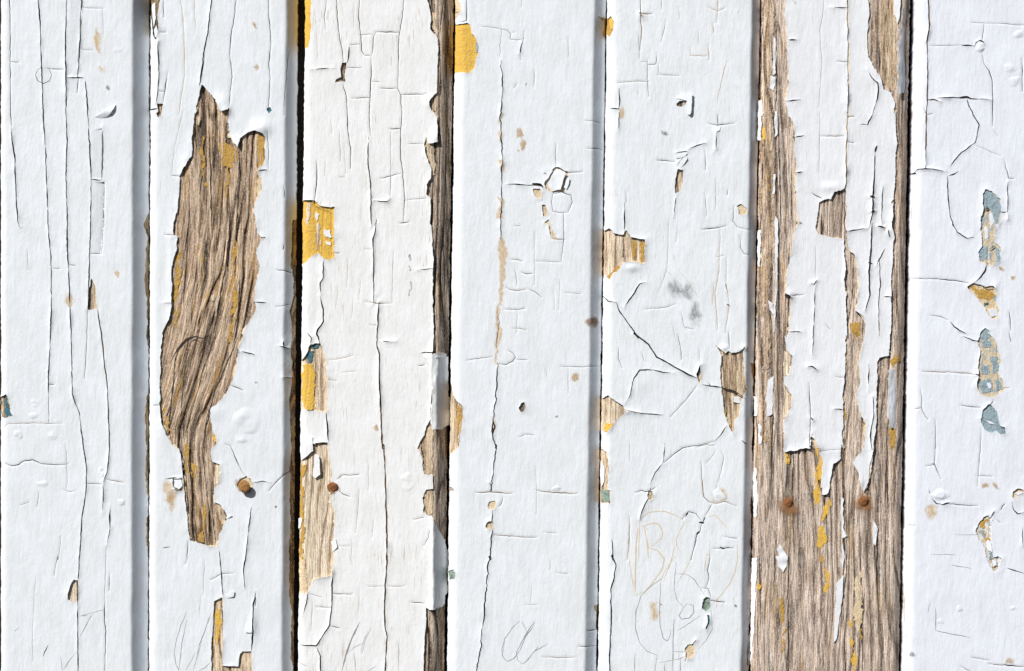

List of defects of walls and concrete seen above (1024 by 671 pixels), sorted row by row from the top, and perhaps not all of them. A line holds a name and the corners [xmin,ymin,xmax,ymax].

crack [4,0,120,668]
peeling [143,85,265,623]
peeling [211,591,252,671]
peeling [289,200,337,671]
crack [257,0,422,671]
peeling [417,0,479,671]
crack [456,0,749,671]
peeling [603,228,645,280]
peeling [716,0,910,671]
crack [910,0,1015,290]
crack [916,371,1024,543]
peeling [967,282,1006,435]